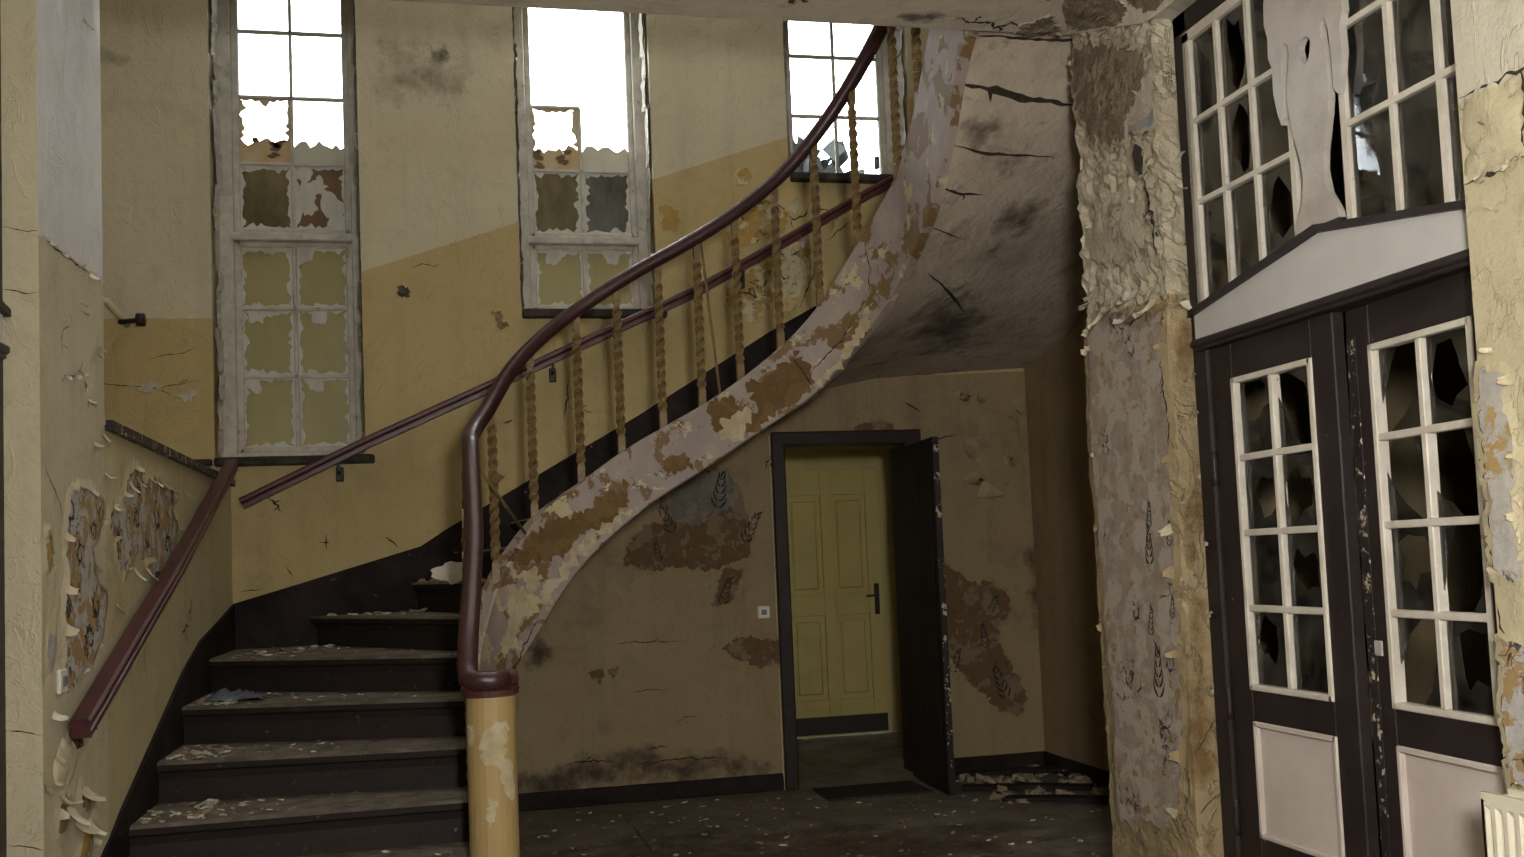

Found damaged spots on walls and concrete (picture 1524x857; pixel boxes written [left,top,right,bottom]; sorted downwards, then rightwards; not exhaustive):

peeling [488,7,682,333]
crack [945,188,986,200]
crack [954,145,1055,158]
crack [965,84,1073,107]
spalling [1013,0,1165,180]
crack [1460,67,1524,185]
crack [928,273,964,312]
peeling [706,312,871,442]
peeling [1471,356,1524,592]
peeling [41,453,186,721]
peeling [500,452,763,658]
peeling [1494,631,1524,791]